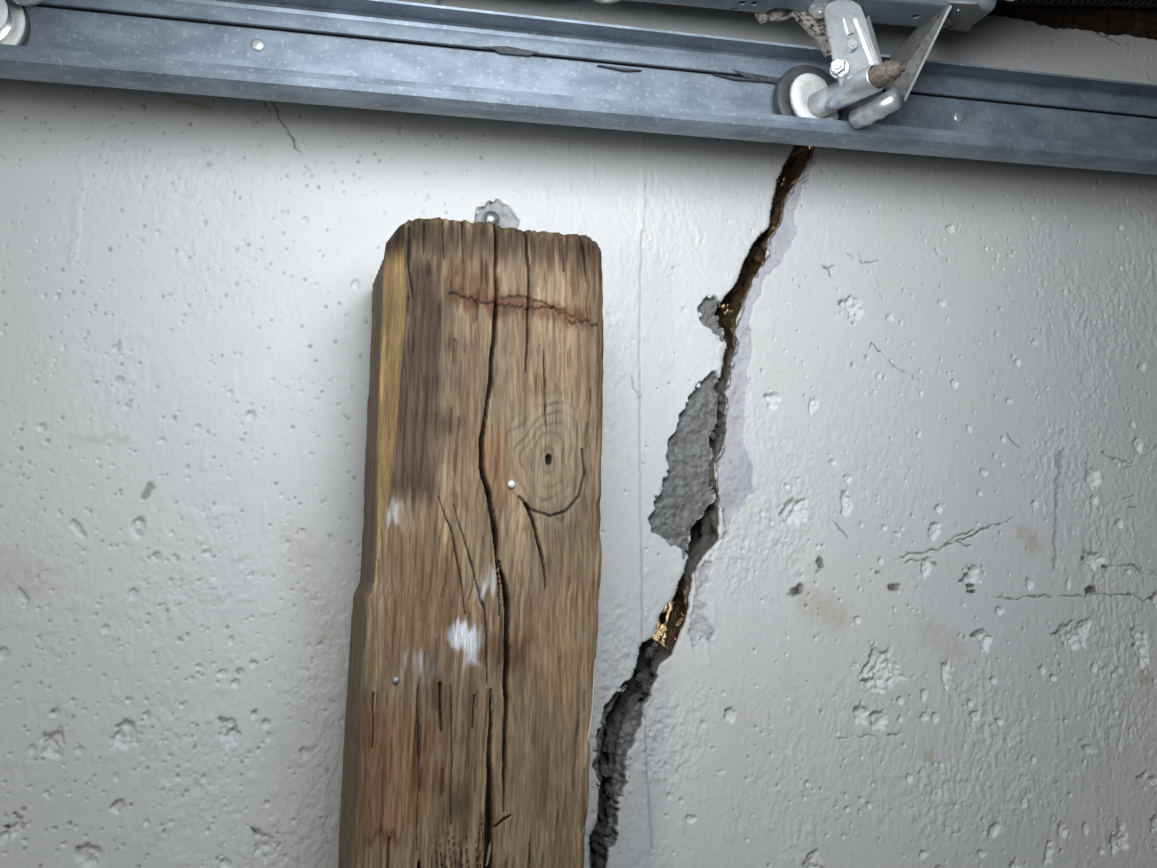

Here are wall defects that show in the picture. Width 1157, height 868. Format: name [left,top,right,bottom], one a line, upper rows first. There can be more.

spalling [648,149,821,655]
crack [588,145,815,868]
crack [891,515,1015,567]
crack [970,562,1157,604]
peeling [849,615,941,733]
peeling [1045,612,1124,678]
peeling [1126,616,1153,680]